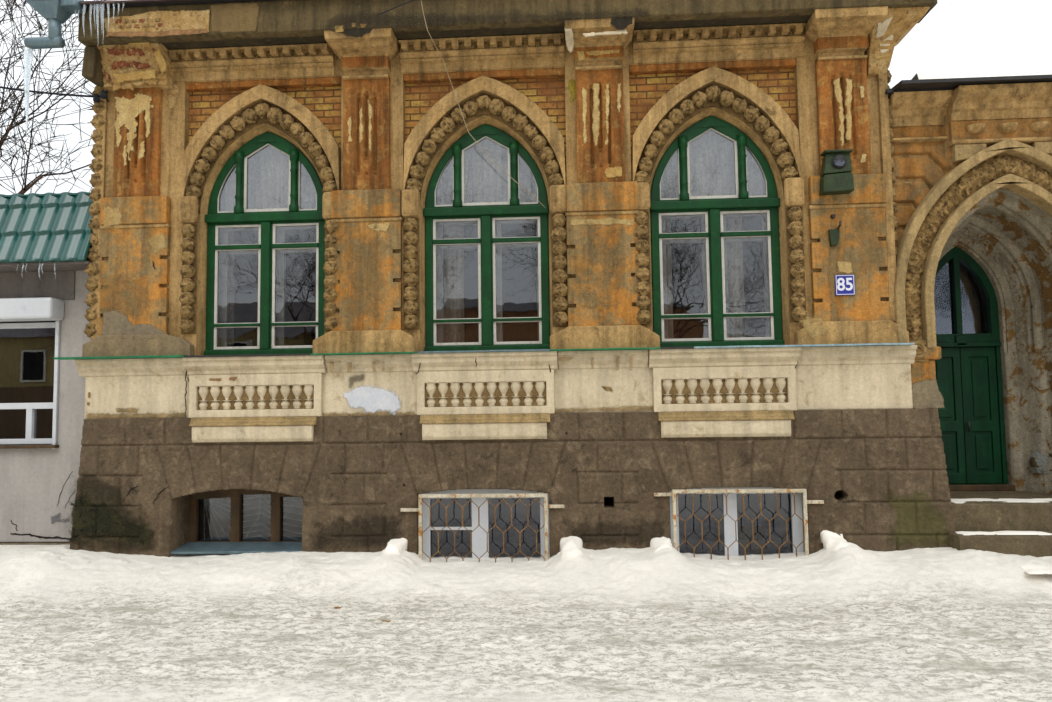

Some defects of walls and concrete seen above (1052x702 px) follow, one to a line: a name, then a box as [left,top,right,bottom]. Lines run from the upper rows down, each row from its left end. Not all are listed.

flaking render [101,42,168,165]
peeling [347,100,373,150]
peeling [582,83,622,146]
peeling [834,78,864,146]
crack [10,521,69,540]